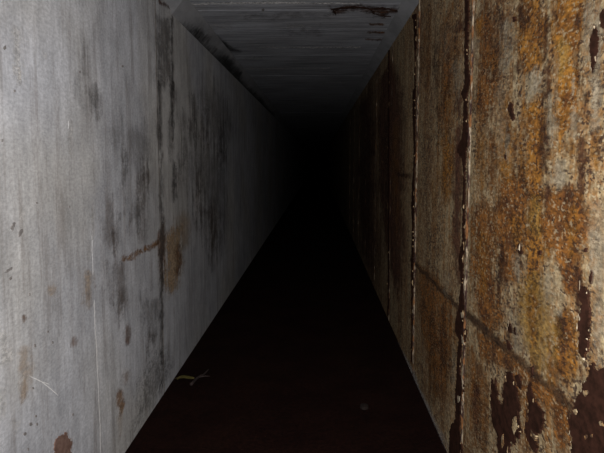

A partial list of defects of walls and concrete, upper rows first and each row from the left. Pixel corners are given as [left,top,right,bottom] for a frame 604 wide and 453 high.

damp [158,17,174,125]
rust [332,5,398,41]
peeling [588,9,604,73]
rust [123,225,183,293]
rust [466,0,595,453]
peeling [567,270,604,453]
peeling [489,366,546,453]